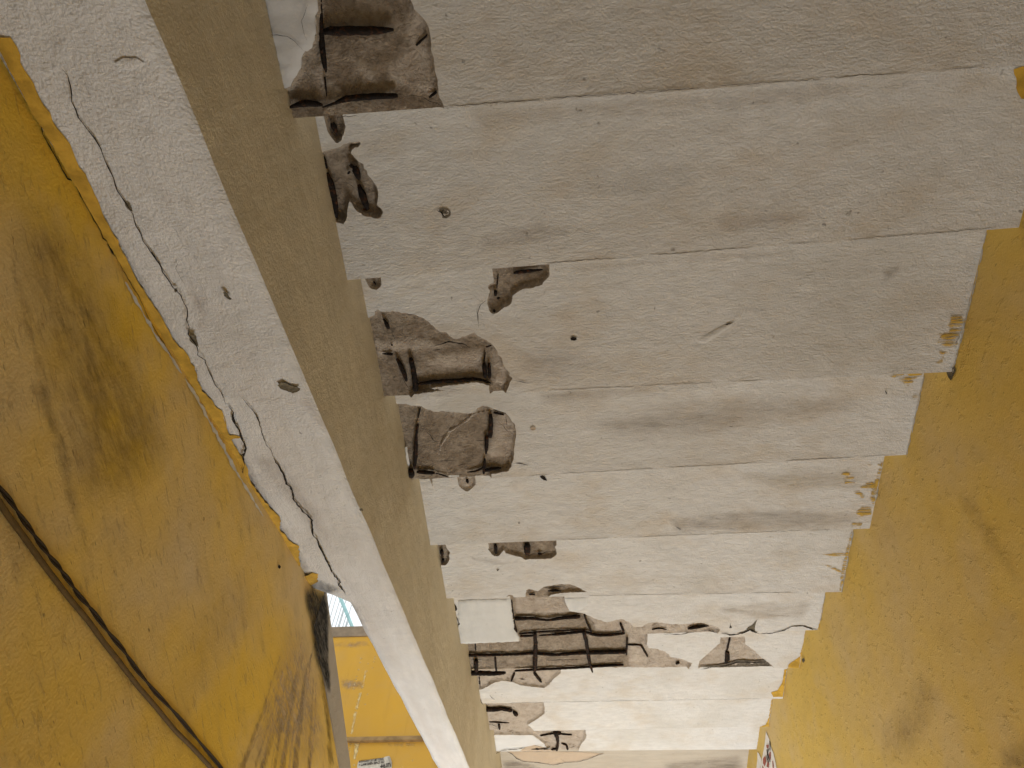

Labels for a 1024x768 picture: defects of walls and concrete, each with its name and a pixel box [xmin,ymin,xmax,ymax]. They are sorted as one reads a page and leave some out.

spalling [266,0,444,224]
crack [41,127,171,355]
crack [62,69,345,593]
spalling [487,264,550,314]
spalling [369,310,516,492]
spalling [488,540,557,560]
spalling [468,584,774,690]
crack [722,625,816,636]
spalling [486,702,602,765]